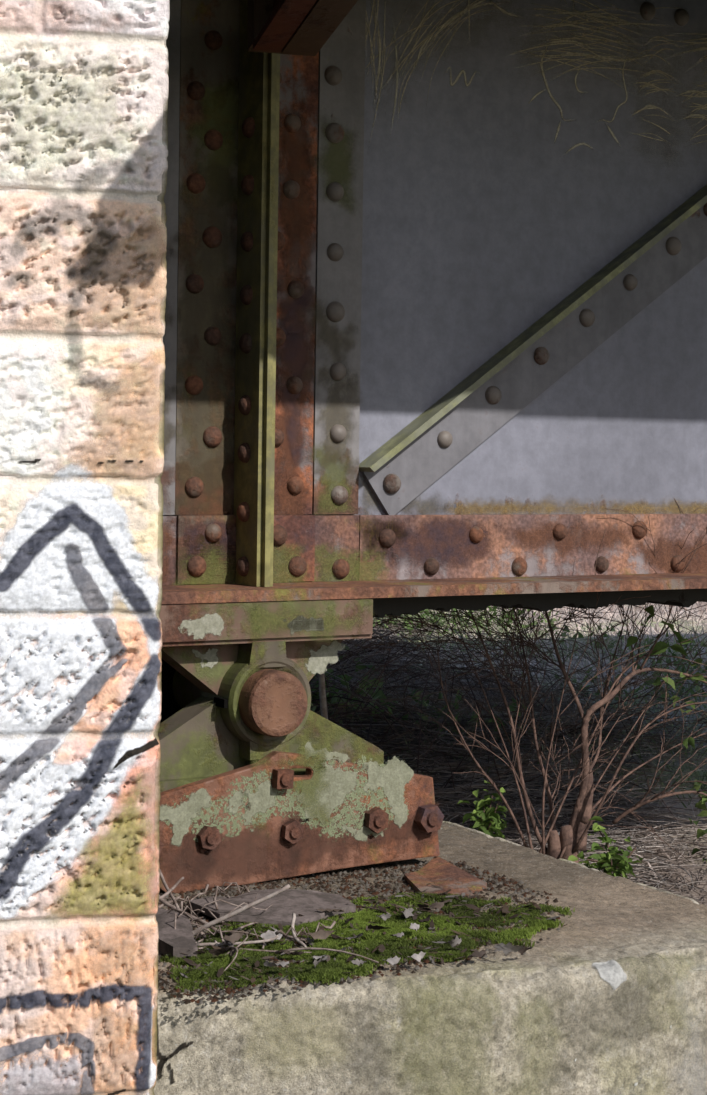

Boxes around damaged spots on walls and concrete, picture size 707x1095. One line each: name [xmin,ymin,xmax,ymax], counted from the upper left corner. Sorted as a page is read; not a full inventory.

rust [274,101,316,515]
rust [161,460,236,583]
rust [365,518,488,566]
rust [517,525,623,553]
rust [639,539,707,573]
peeling [178,613,224,668]
peeling [305,640,345,674]
peeling [227,780,278,832]
rust [161,819,353,883]
peeling [297,742,414,828]
peeling [341,825,383,841]
rust [368,819,433,845]